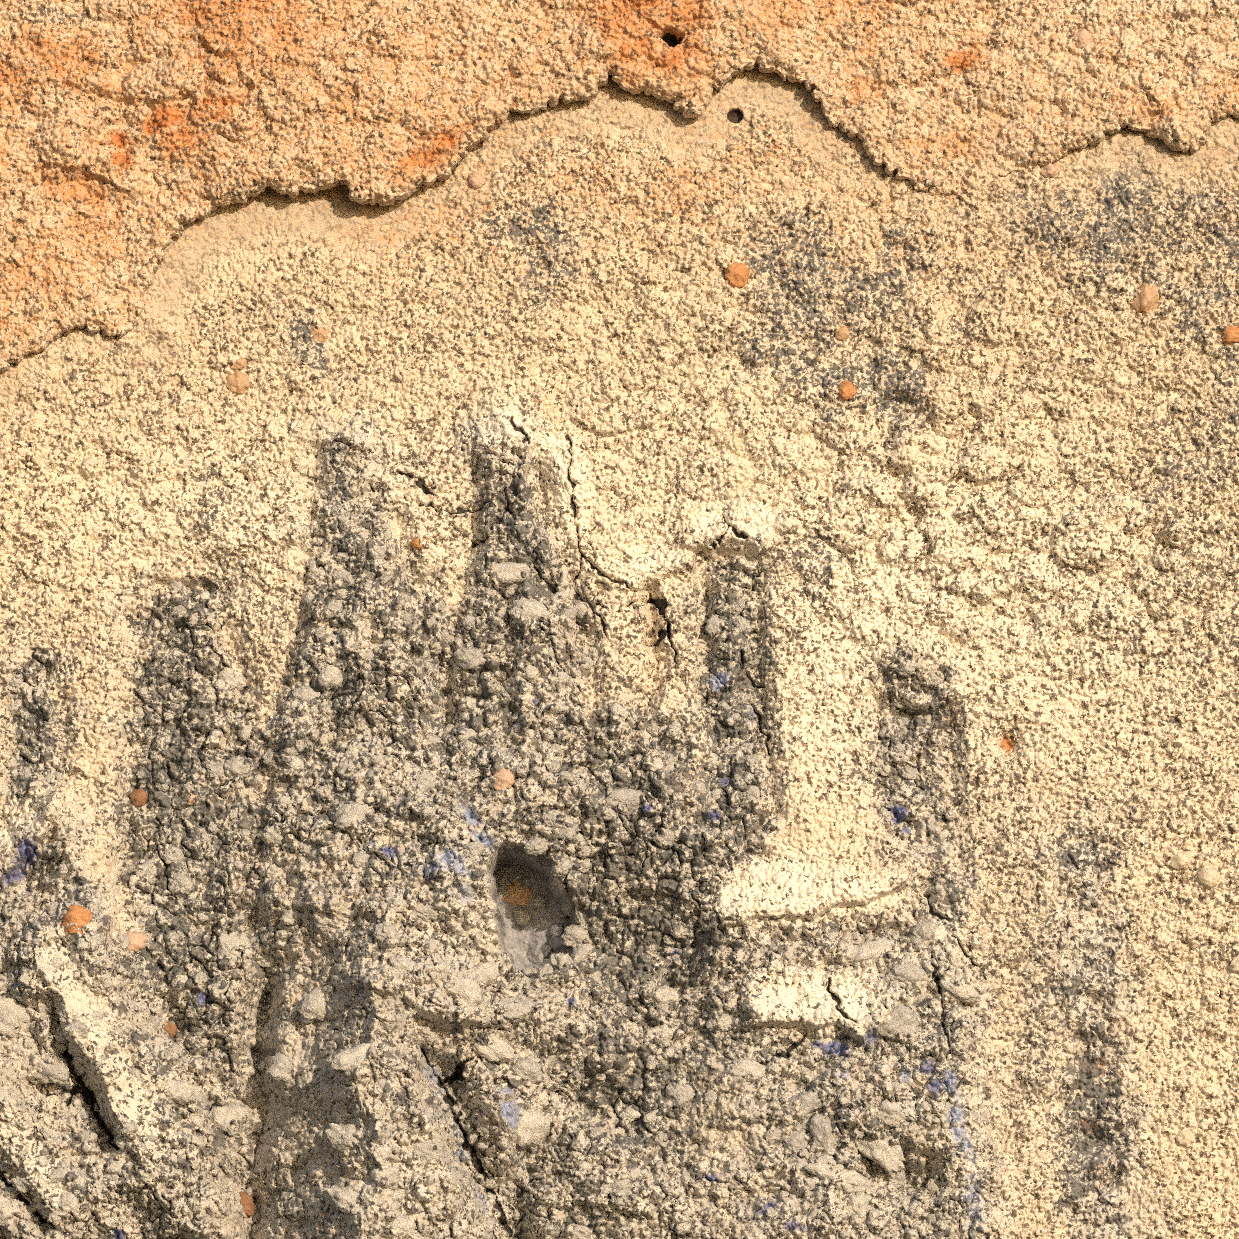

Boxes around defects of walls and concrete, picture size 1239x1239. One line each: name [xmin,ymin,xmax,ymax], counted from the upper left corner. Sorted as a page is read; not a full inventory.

rust [566,0,991,110]
rust [0,0,384,360]
rust [349,196,497,255]
rust [383,121,470,192]
peeling [0,0,1239,372]
rust [541,136,836,231]
rust [891,121,989,165]
crack [509,418,529,444]
crack [396,471,516,547]
crack [534,434,678,664]
crack [709,517,748,549]
spalling [0,426,1008,1239]